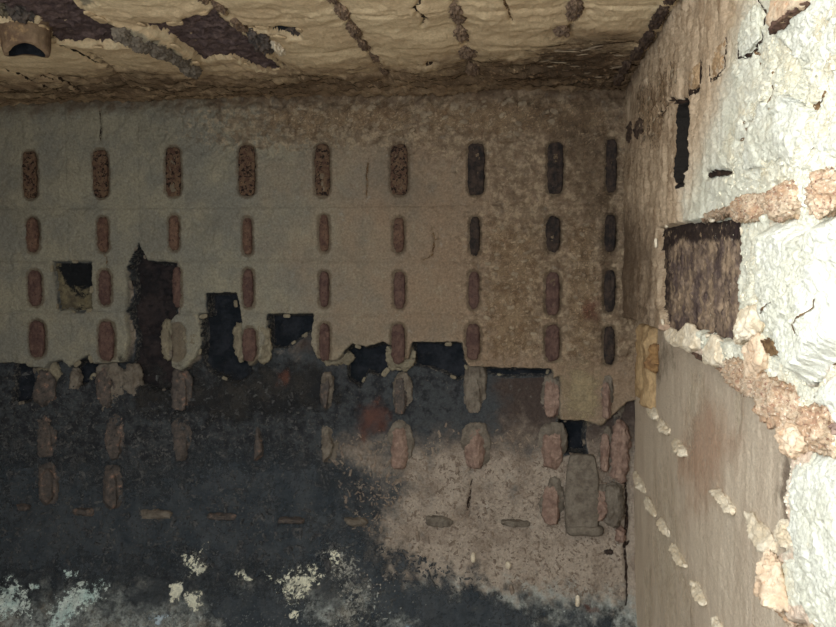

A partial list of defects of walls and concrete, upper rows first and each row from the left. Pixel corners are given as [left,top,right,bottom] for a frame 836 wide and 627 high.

spalling [0,0,114,49]
spalling [136,8,303,71]
crack [658,0,779,117]
spalling [128,246,177,391]
spalling [198,294,254,381]
spalling [654,217,779,379]
crack [791,299,815,334]
damp [0,576,40,621]
damp [46,570,203,627]
damp [182,542,209,576]
damp [268,550,379,627]
damp [418,588,531,627]